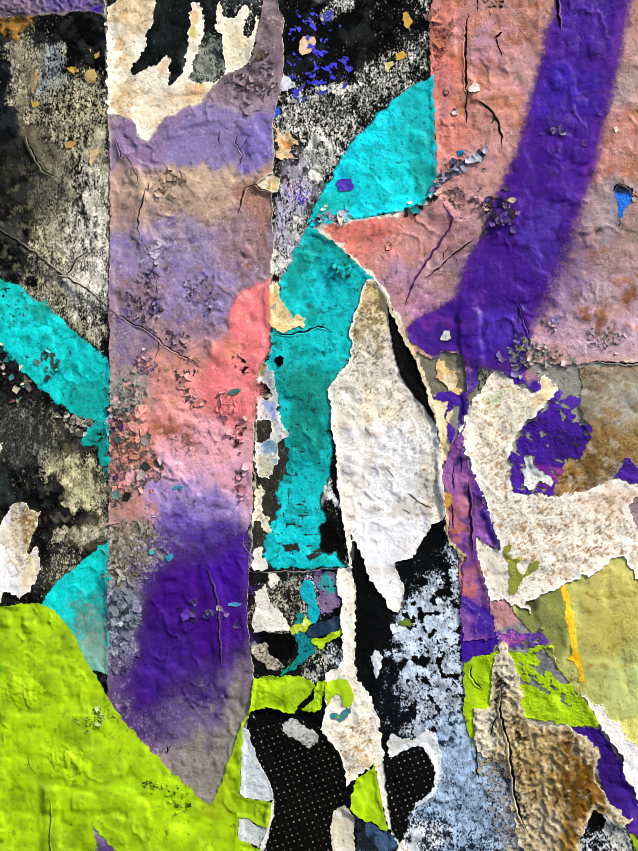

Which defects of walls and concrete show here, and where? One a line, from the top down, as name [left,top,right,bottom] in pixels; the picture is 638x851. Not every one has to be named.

peeling [225,50,279,115]
crack [461,0,505,147]
crack [218,131,247,166]
peeling [394,145,521,234]
crack [405,202,476,306]
crack [108,266,202,377]
peeling [122,237,251,500]
peeling [53,411,93,437]
peeling [97,348,165,674]
crack [205,565,222,668]
crack [467,665,528,833]
crack [46,800,54,851]